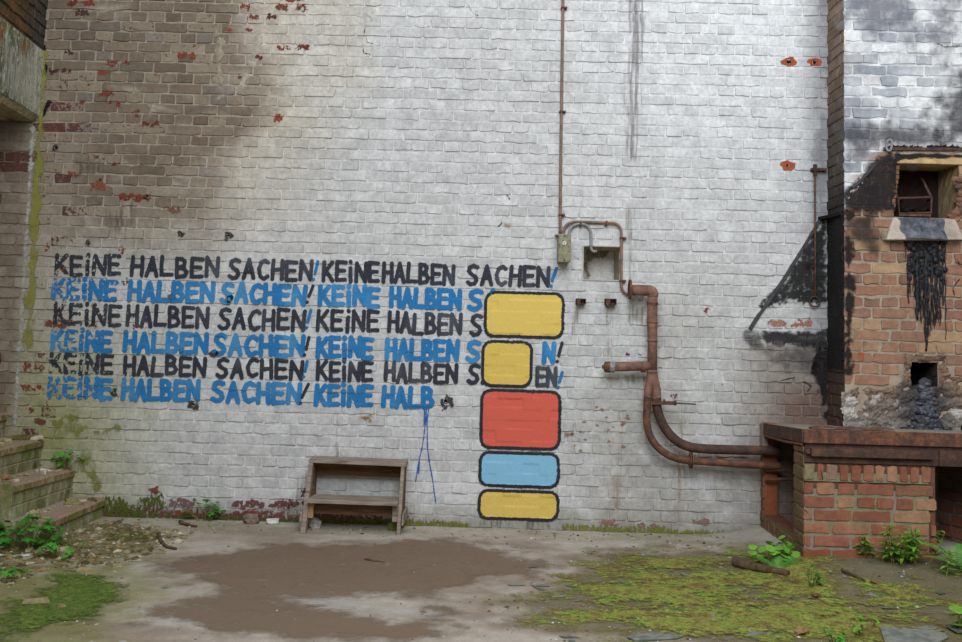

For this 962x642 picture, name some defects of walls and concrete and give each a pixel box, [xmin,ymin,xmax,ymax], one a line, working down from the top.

peeling [67,0,95,16]
peeling [240,0,308,32]
peeling [119,192,151,203]
spalling [947,176,962,222]
leakage [12,125,36,432]
spalling [840,354,962,430]